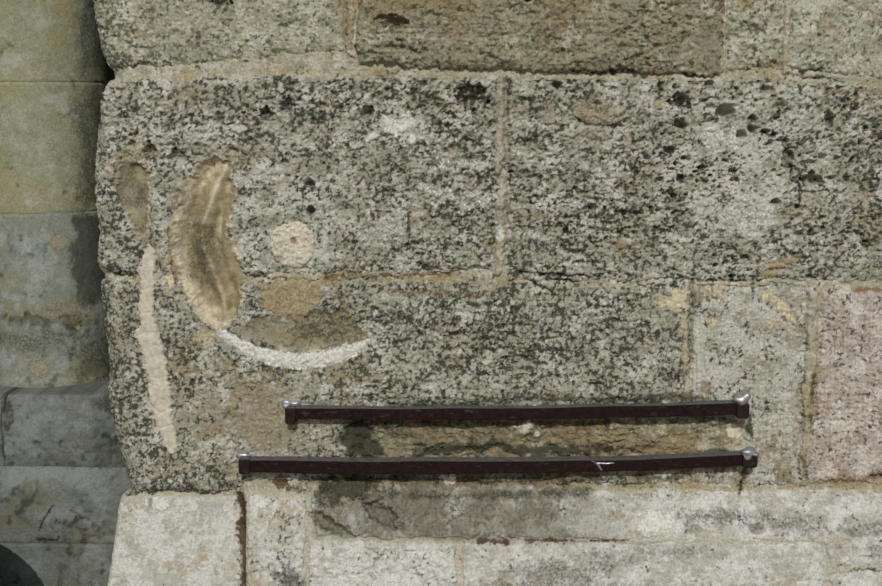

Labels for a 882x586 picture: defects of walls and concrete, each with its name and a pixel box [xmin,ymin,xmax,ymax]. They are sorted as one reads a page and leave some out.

rust [235,491,247,586]